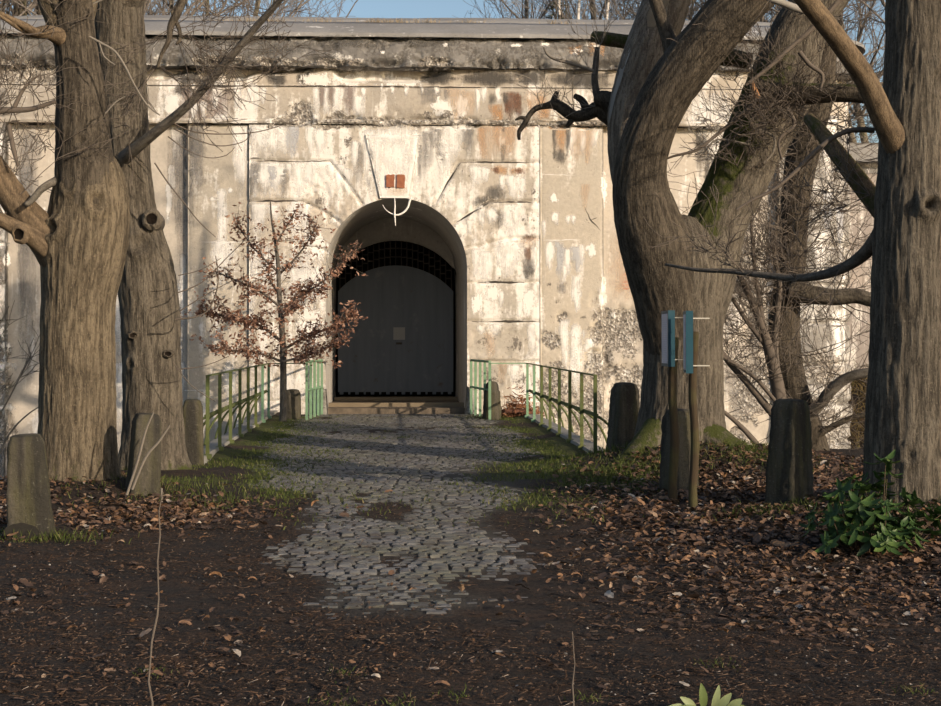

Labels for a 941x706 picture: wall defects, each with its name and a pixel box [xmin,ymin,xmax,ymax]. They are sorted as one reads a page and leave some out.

rust [479,92,570,161]
leakage [161,68,608,346]
leakage [560,320,595,391]